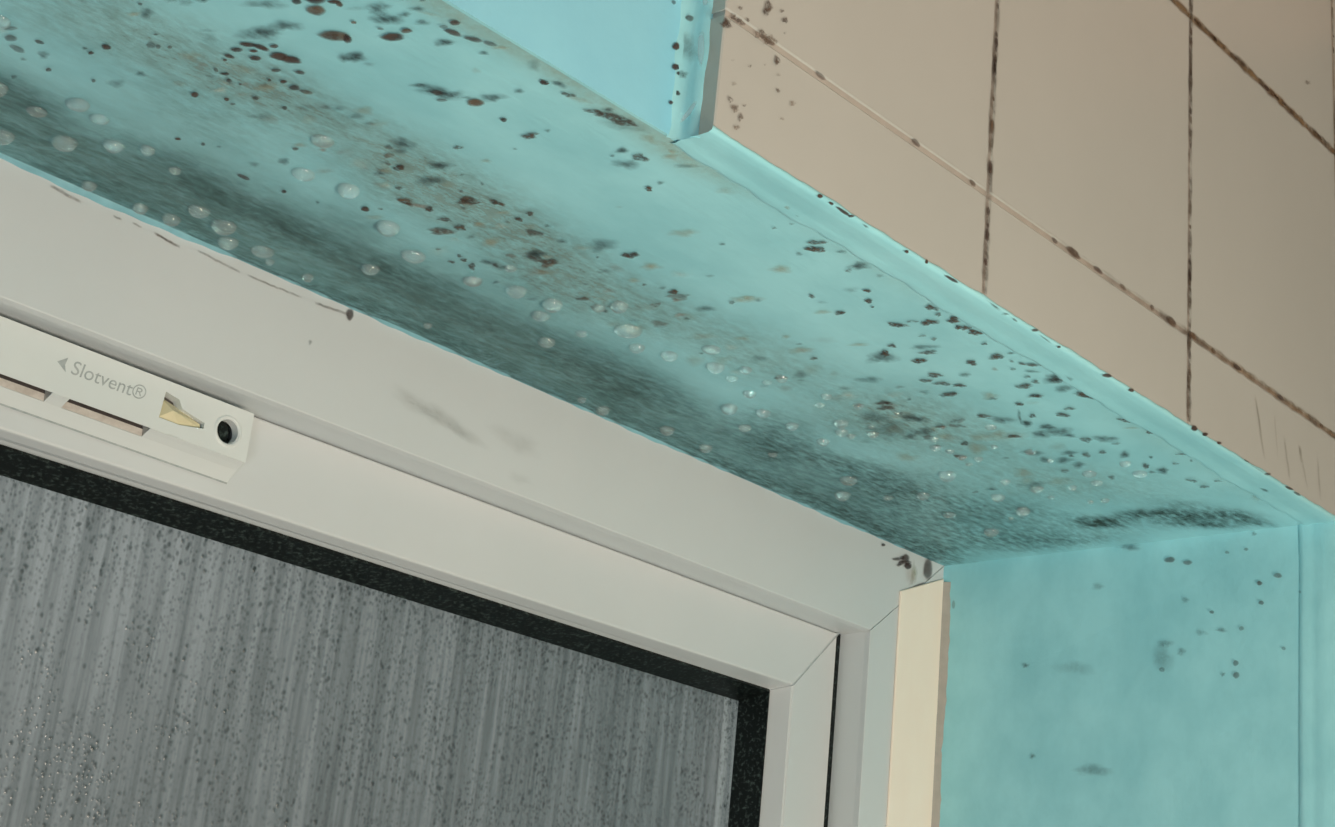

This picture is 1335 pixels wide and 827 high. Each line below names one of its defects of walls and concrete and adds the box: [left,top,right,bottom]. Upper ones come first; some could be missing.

water stain [292,0,343,15]
water stain [373,0,424,41]
water stain [124,21,678,312]
water stain [669,43,693,118]
water stain [721,8,779,64]
water stain [970,32,998,186]
water stain [1171,0,1335,156]
water stain [0,92,671,420]
water stain [888,305,1112,471]
water stain [1167,180,1335,444]
water stain [758,437,1003,586]
water stain [1083,511,1260,527]